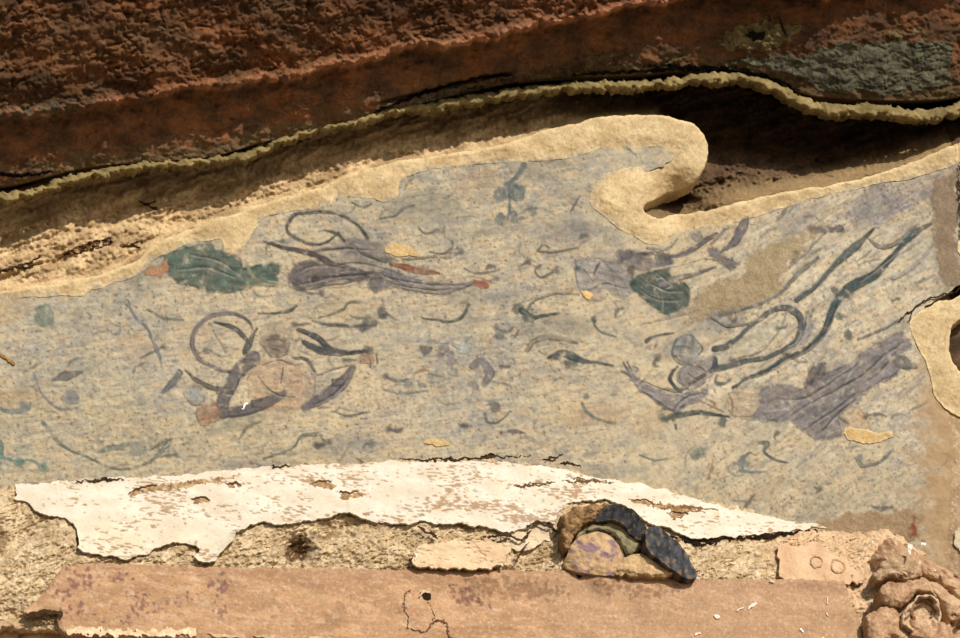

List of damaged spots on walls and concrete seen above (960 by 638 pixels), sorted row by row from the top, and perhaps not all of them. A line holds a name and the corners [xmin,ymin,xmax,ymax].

crack [399,453,613,488]
flaking render [14,459,925,586]
crack [402,589,452,638]